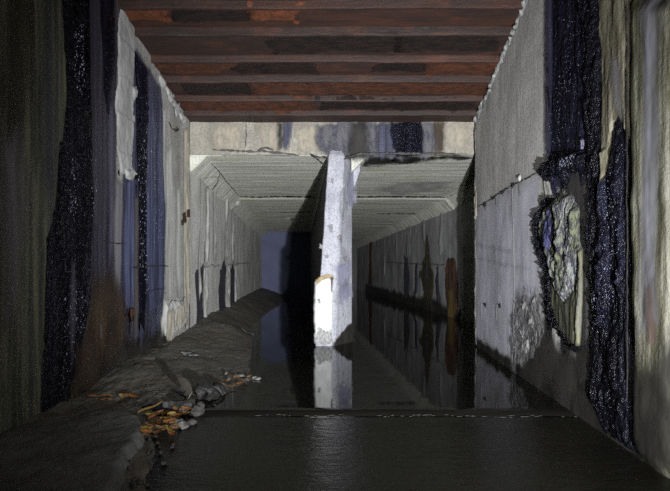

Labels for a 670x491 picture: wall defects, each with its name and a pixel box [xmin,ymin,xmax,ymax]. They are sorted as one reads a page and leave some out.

rust [123,10,172,22]
rust [246,0,305,24]
rust [154,63,230,75]
rust [179,56,500,114]
water stain [315,122,469,167]
water stain [39,0,191,413]
water stain [473,0,638,456]
spalling [538,189,582,344]
spalling [509,290,546,373]